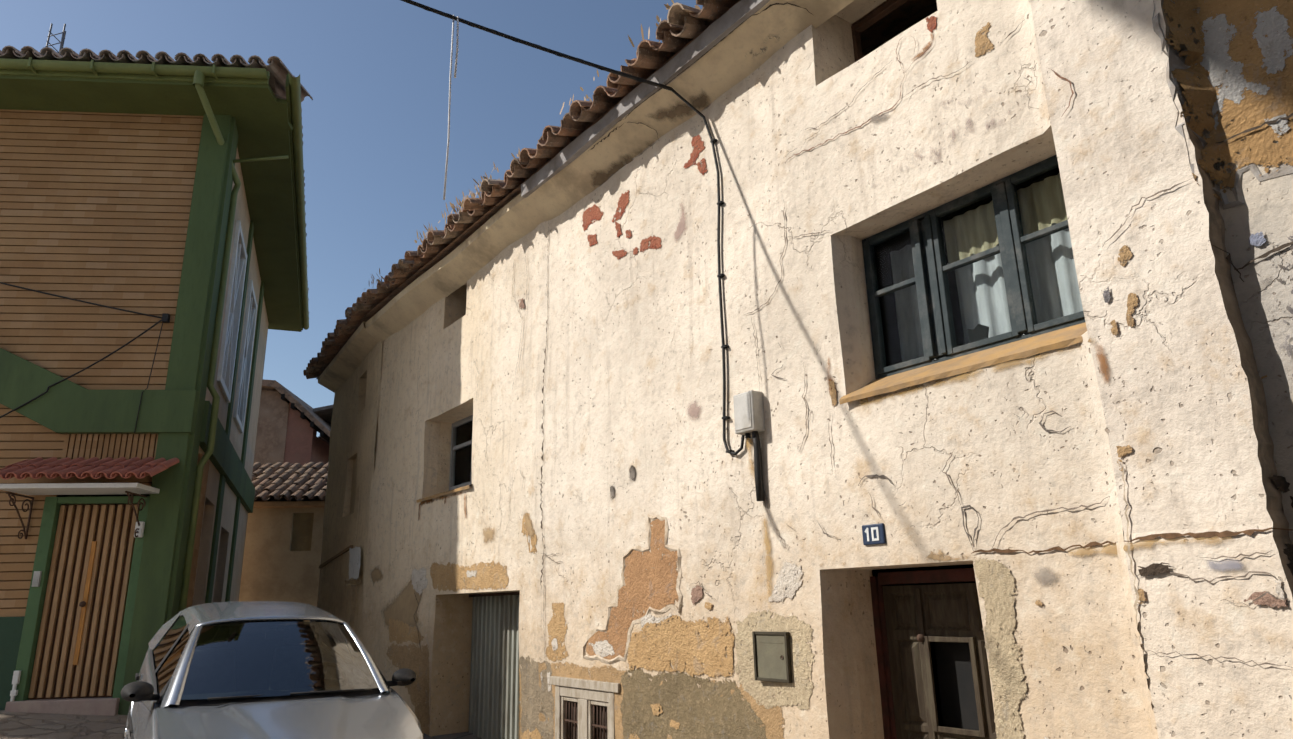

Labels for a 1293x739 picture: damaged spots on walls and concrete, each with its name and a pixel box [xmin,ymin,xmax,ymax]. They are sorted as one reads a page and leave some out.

flaking render [582,190,686,259]
flaking render [684,135,707,175]
crack [787,33,972,159]
crack [1025,68,1074,117]
crack [1103,173,1222,246]
peeling [1152,0,1293,210]
peeling [688,402,700,418]
crack [744,205,903,519]
crack [1014,406,1071,433]
flaking render [383,560,509,735]
peeling [518,513,814,739]
peeling [927,550,1027,739]